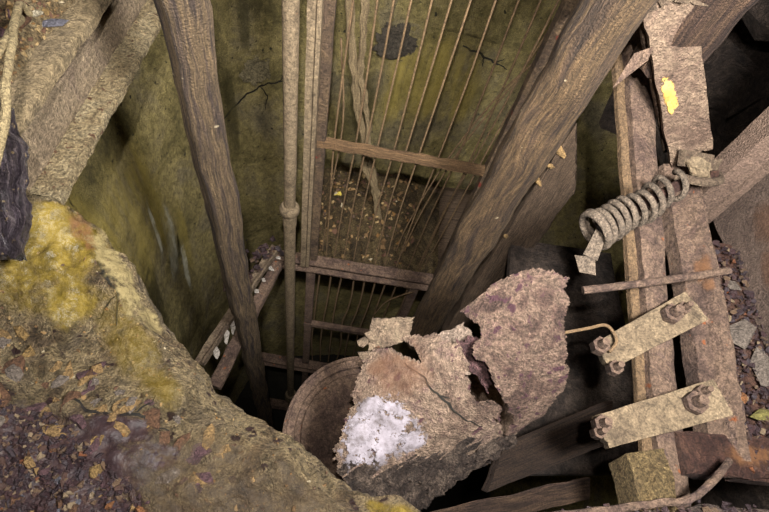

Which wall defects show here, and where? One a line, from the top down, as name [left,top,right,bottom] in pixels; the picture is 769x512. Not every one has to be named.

crack [463,45,507,70]
crack [224,74,301,119]